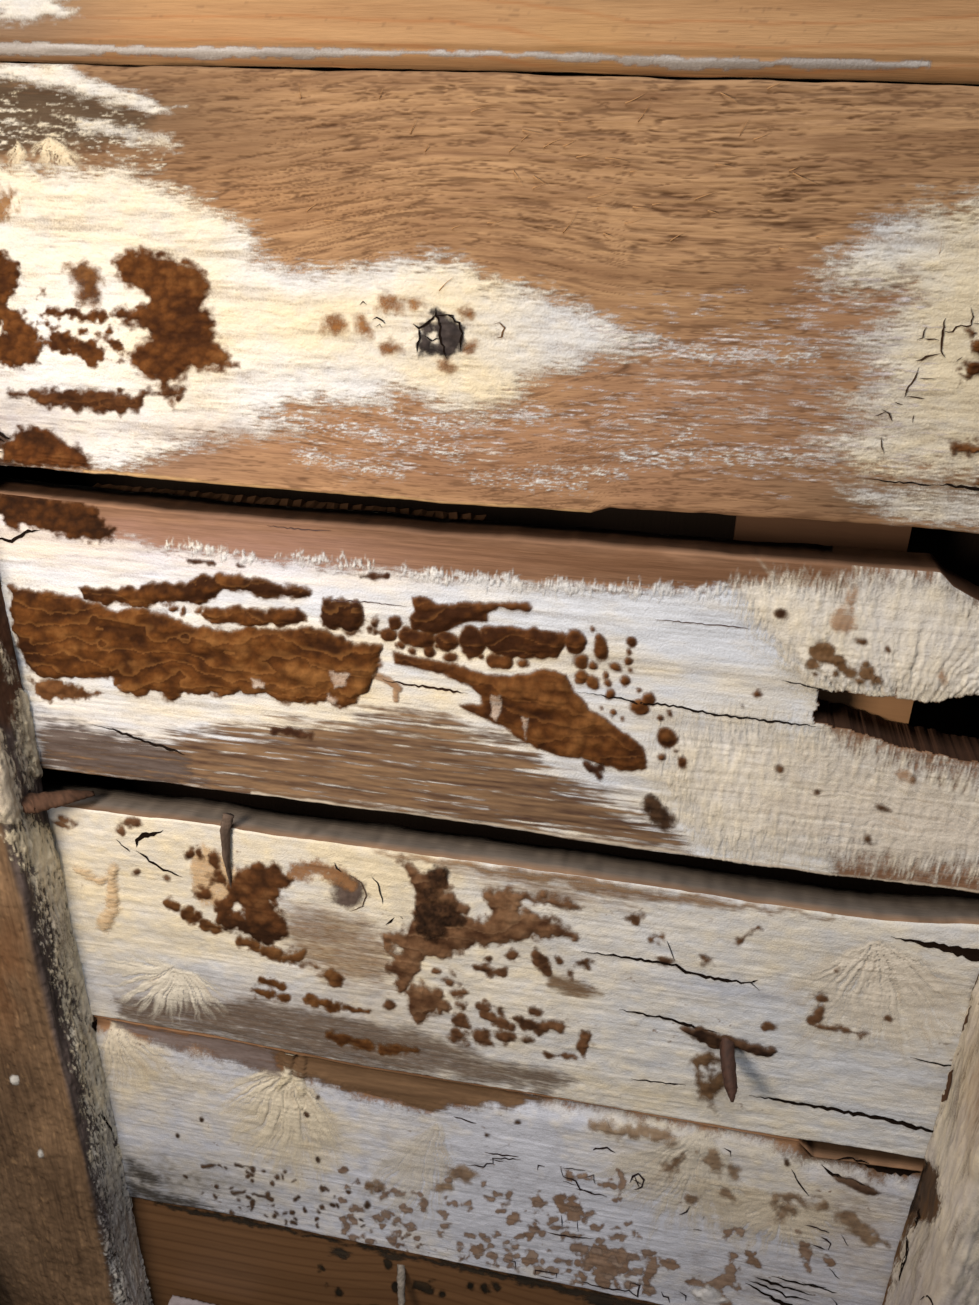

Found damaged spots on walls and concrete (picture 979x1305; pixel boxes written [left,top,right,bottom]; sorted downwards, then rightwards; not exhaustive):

leakage [0,63,979,528]
peeling [327,672,349,704]
peeling [372,673,402,703]
peeling [491,695,502,720]
leakage [0,514,979,1305]
crack [582,942,759,990]
crack [891,936,979,1031]
crack [622,1009,717,1033]
crack [633,1078,684,1086]
crack [749,1057,953,1133]
peeling [338,1166,761,1305]
peeling [795,1230,836,1273]